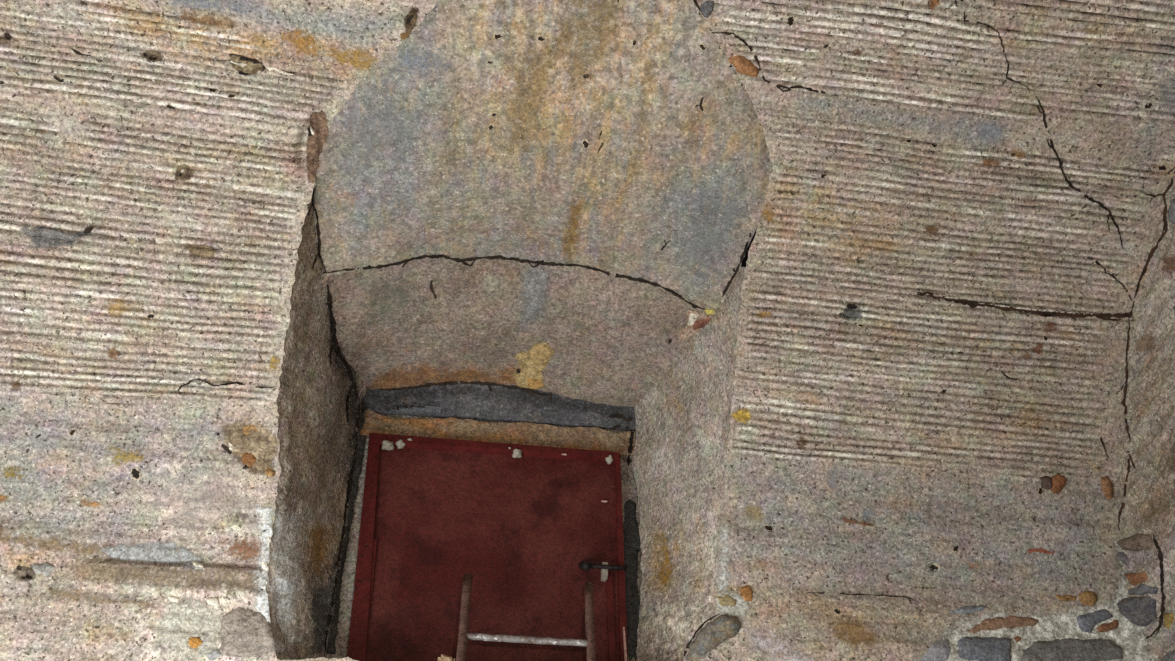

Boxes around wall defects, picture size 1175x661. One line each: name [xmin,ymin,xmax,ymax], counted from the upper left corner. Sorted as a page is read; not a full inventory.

crack [308,187,751,656]
crack [693,0,836,96]
crack [917,0,1175,530]
crack [1146,534,1166,639]